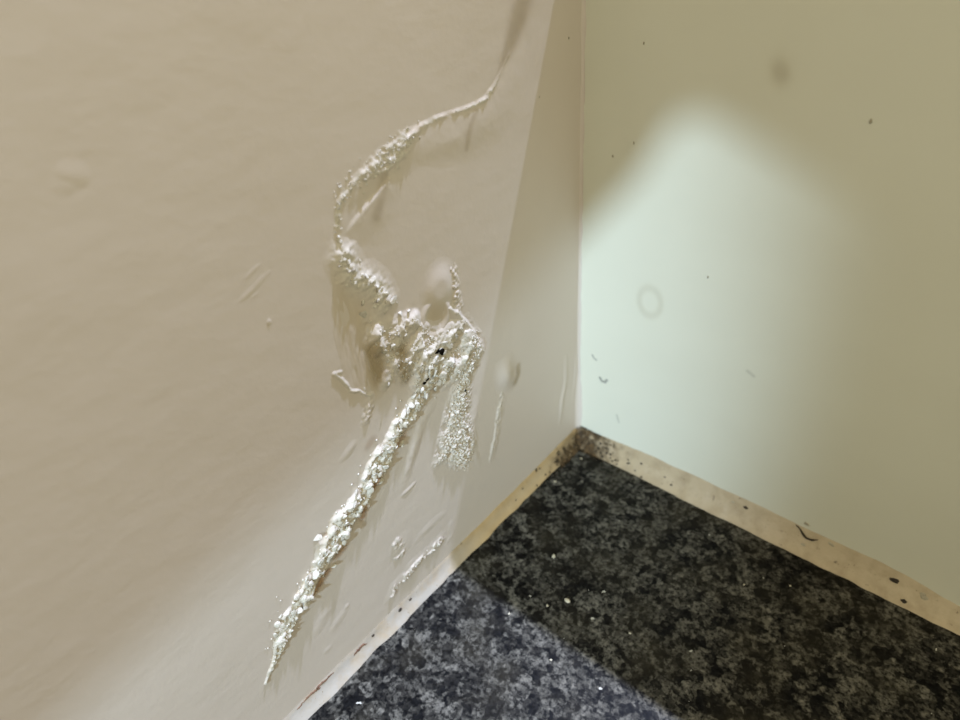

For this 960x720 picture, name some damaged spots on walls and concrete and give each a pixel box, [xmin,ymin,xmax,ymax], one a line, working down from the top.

damp [264,330,484,685]
damp [535,426,642,487]